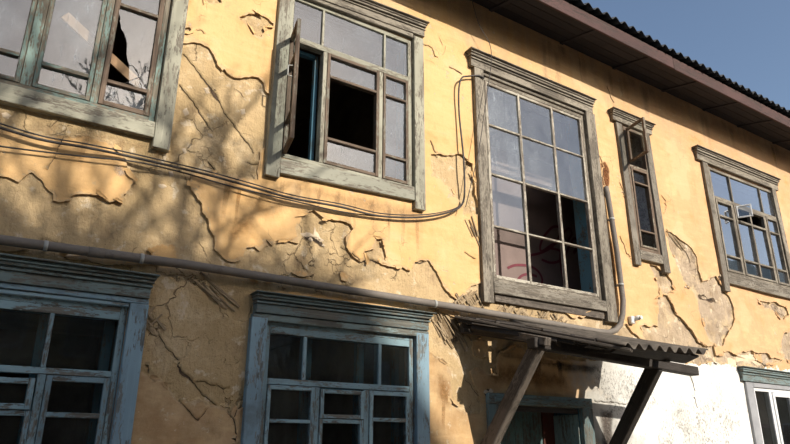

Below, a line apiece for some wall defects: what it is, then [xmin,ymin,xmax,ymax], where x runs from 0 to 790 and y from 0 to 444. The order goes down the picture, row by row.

flaking render [240,9,274,37]
crack [179,53,259,179]
flaking render [0,42,790,368]
crack [148,311,243,444]
flaking render [0,248,395,417]
flaking render [405,303,527,414]